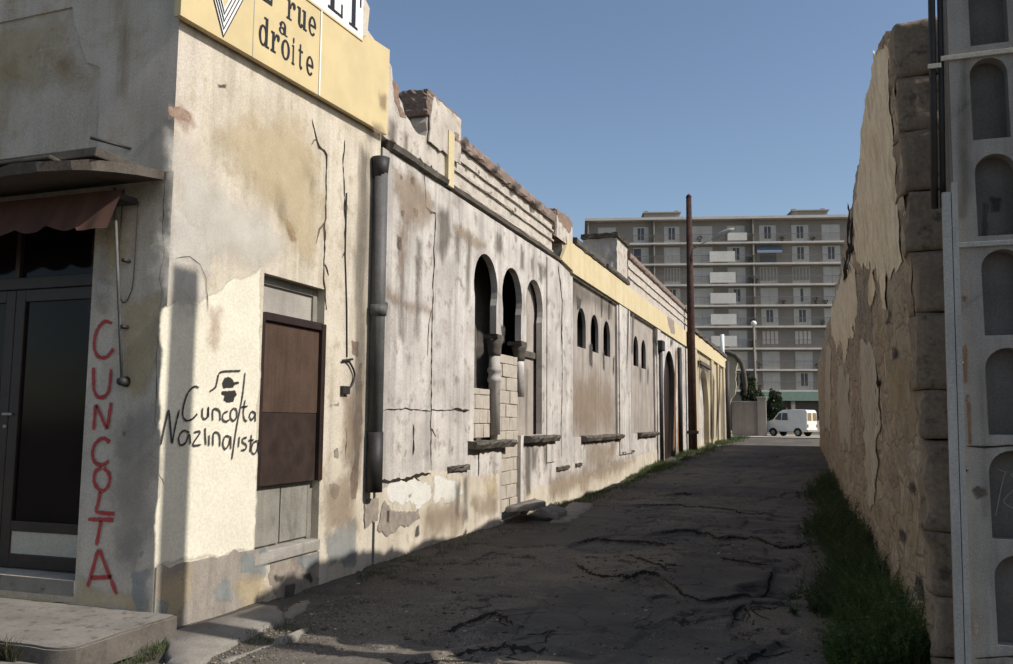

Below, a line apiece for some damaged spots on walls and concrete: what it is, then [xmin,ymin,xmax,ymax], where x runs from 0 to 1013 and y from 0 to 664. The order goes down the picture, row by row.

leakage [171,245,187,303]
leakage [228,118,316,255]
peeling [132,208,465,614]
crack [312,119,348,310]
crack [382,174,469,483]
leakage [398,176,480,278]